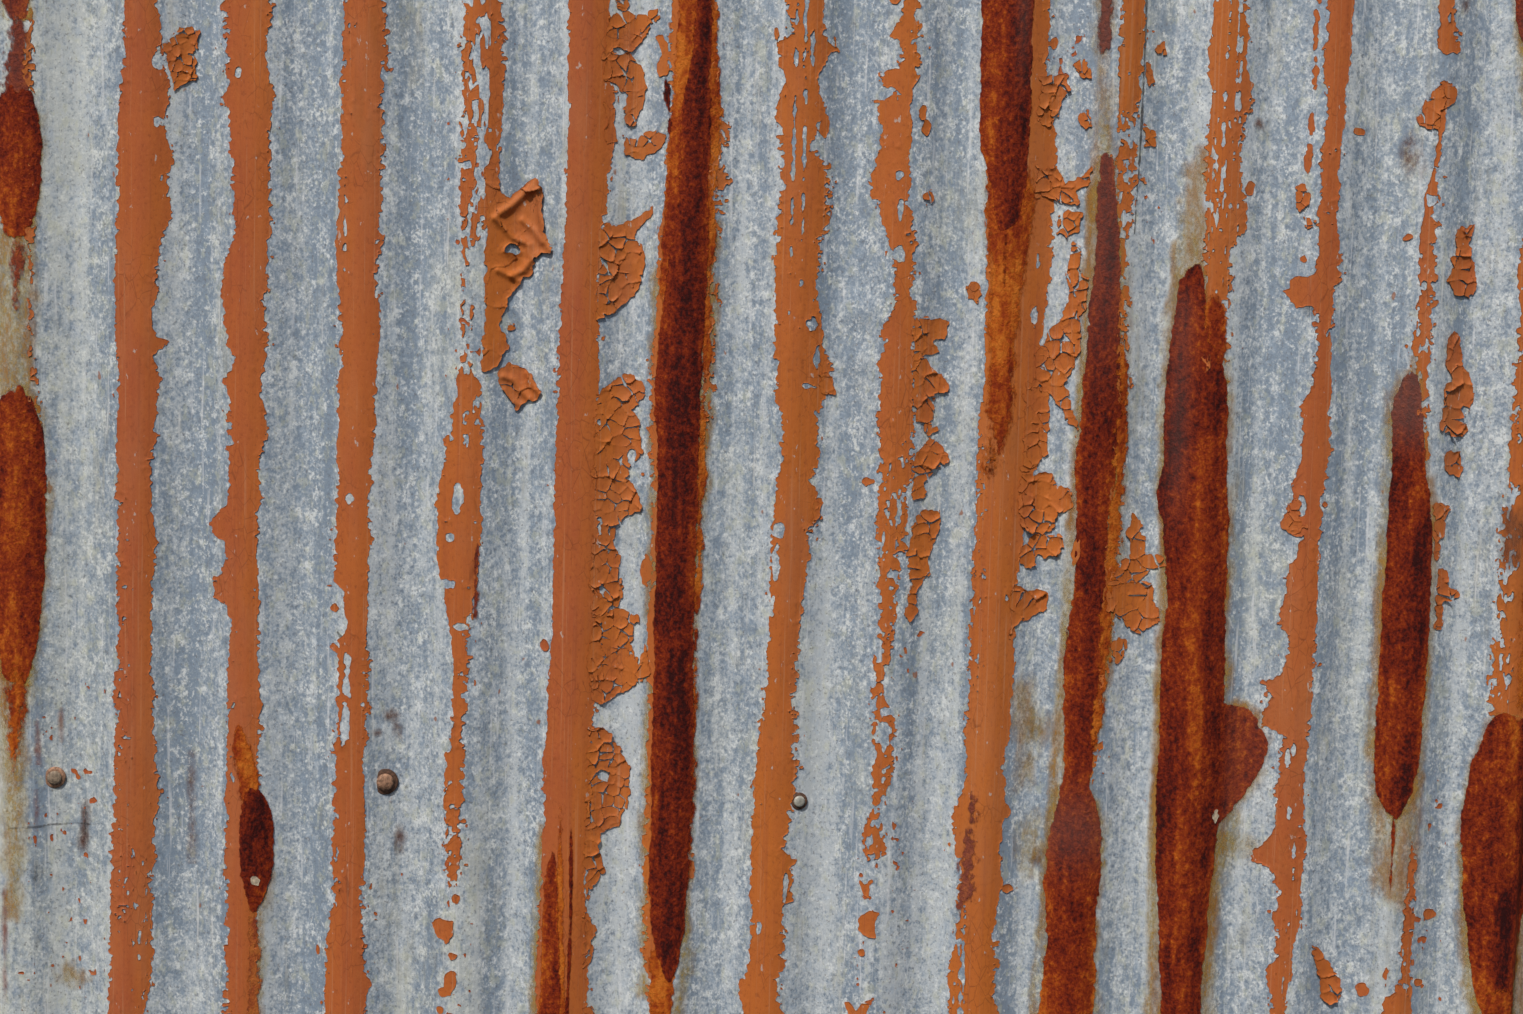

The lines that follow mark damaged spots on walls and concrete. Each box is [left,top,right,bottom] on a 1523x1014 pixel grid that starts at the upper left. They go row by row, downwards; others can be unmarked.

corrosion [0,0,47,918]
peeling [104,0,280,1014]
peeling [432,0,694,1014]
corrosion [641,0,724,1014]
peeling [862,0,950,861]
peeling [944,0,1093,1014]
corrosion [1018,152,1131,1014]
corrosion [1145,150,1268,1014]
peeling [1201,0,1260,382]
peeling [1251,0,1436,1014]
corrosion [1369,370,1436,901]
corrosion [1457,594,1523,1014]